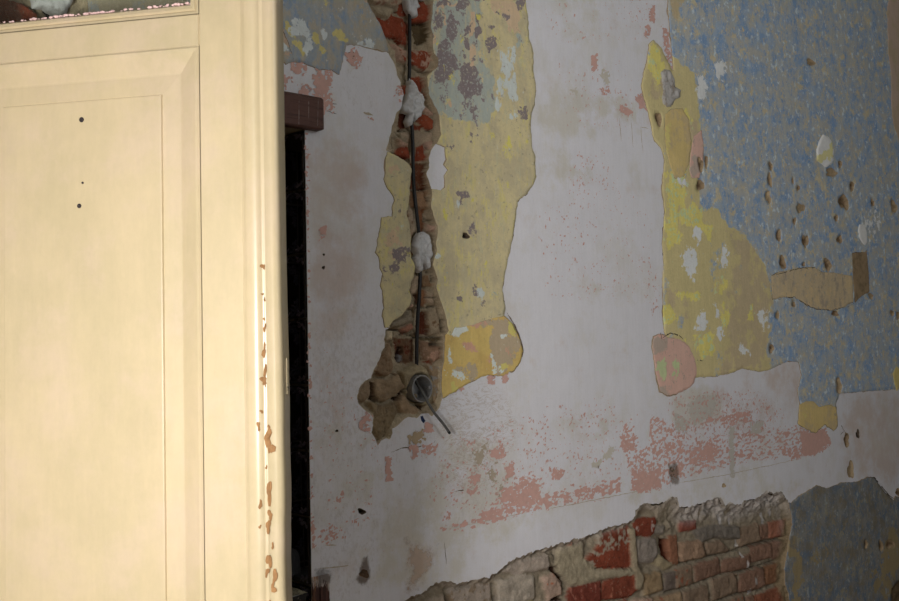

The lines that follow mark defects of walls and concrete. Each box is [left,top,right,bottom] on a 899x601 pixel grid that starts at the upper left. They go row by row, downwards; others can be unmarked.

peeling [259,318,267,387]
peeling [283,0,899,601]
peeling [256,410,276,453]
peeling [258,481,278,601]